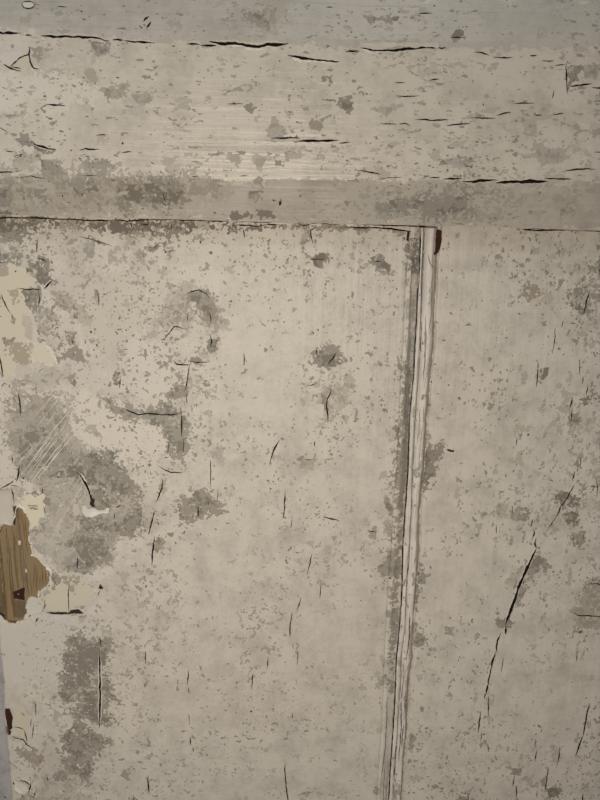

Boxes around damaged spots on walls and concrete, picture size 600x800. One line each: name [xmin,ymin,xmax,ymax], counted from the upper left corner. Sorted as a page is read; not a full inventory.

crack [0,16,151,71]
crack [188,37,461,63]
crack [381,52,600,126]
crack [0,142,56,178]
crack [276,136,349,144]
crack [430,152,600,184]
peeling [0,263,58,381]
crack [124,289,212,562]
peeling [82,491,109,518]
peeling [0,488,103,626]
crack [478,458,581,751]
peeling [5,706,31,742]